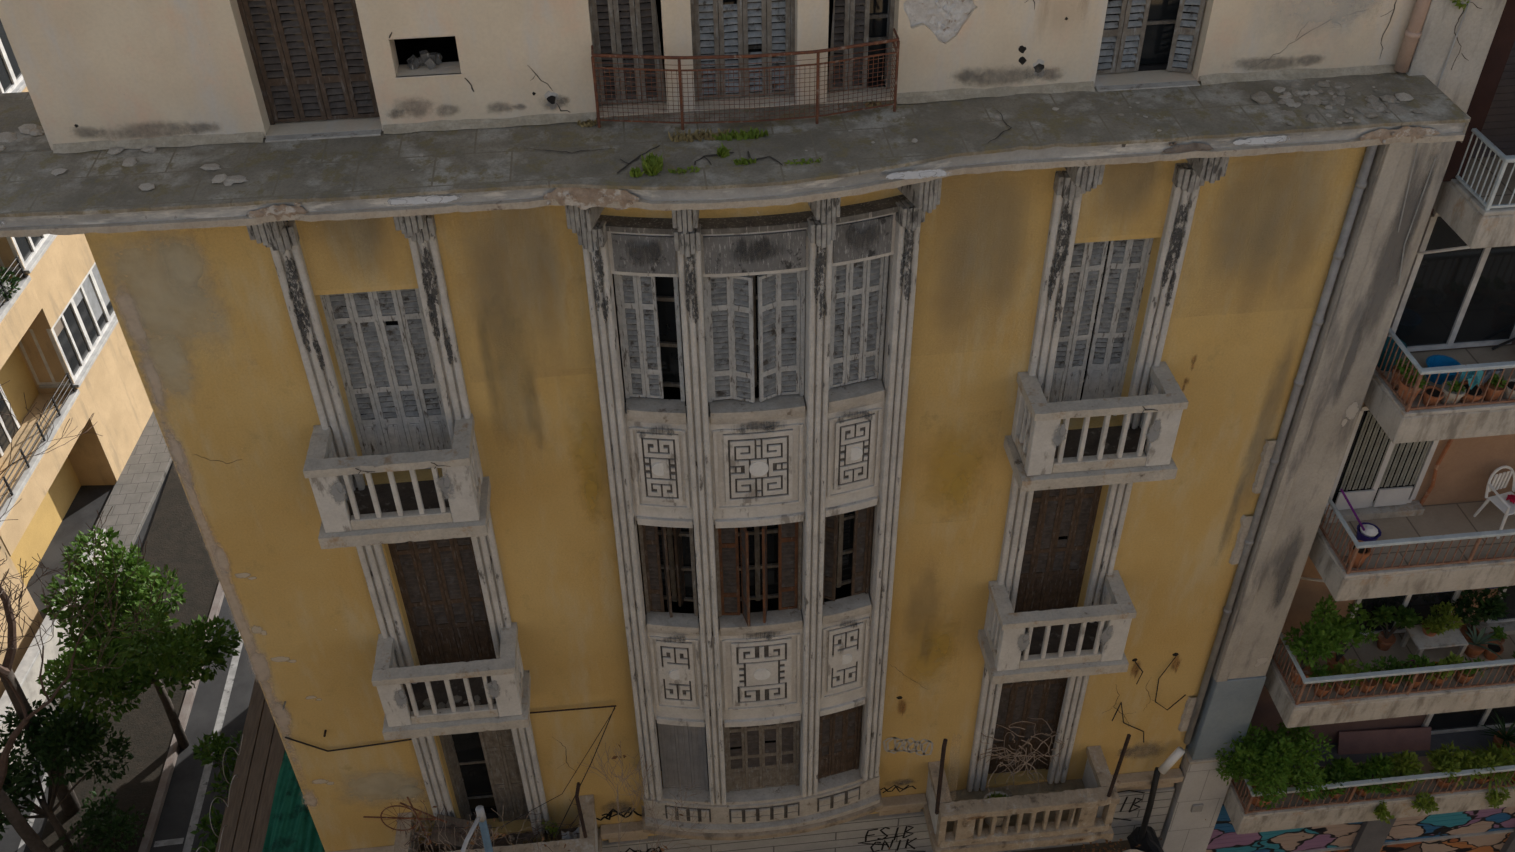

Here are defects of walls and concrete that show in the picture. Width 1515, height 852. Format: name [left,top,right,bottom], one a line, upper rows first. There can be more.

flaking render [904,0,976,42]
crack [1248,0,1397,70]
spalling [543,187,640,210]